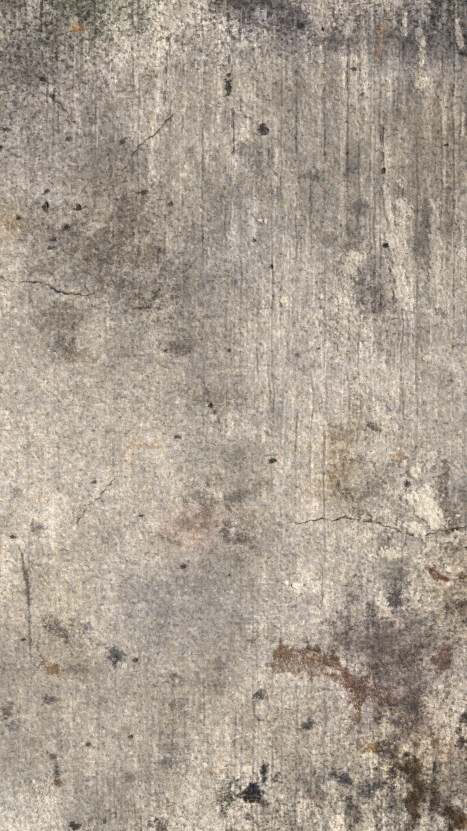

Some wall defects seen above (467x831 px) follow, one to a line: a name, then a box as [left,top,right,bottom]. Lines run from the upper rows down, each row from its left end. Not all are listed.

damp [229,0,354,54]
crack [0,276,97,296]
crack [291,516,467,536]
corrosion [406,639,461,682]
corrosion [271,638,365,729]
corrosion [357,739,382,753]
damp [180,770,233,831]
damp [238,760,280,803]
damp [321,716,466,830]
corrosion [391,753,425,820]
corrosion [445,810,467,831]